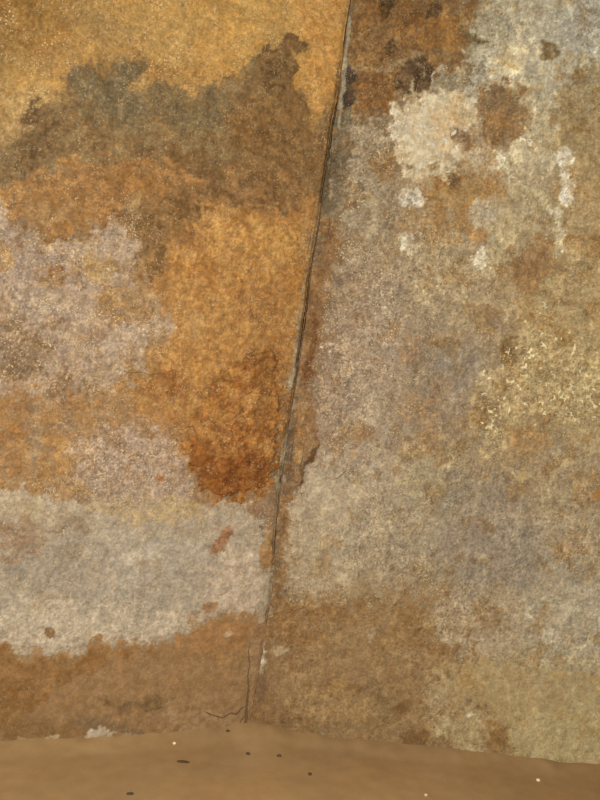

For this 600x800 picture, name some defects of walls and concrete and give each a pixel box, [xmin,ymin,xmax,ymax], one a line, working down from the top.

corrosion [0,149,316,517]
damp [0,0,485,604]
crack [277,37,346,518]
efflorescence [467,244,492,272]
damp [468,195,503,230]
efflorescence [489,149,517,185]
damp [542,53,600,259]
damp [412,463,561,598]
crack [205,642,251,723]
damp [0,581,600,754]